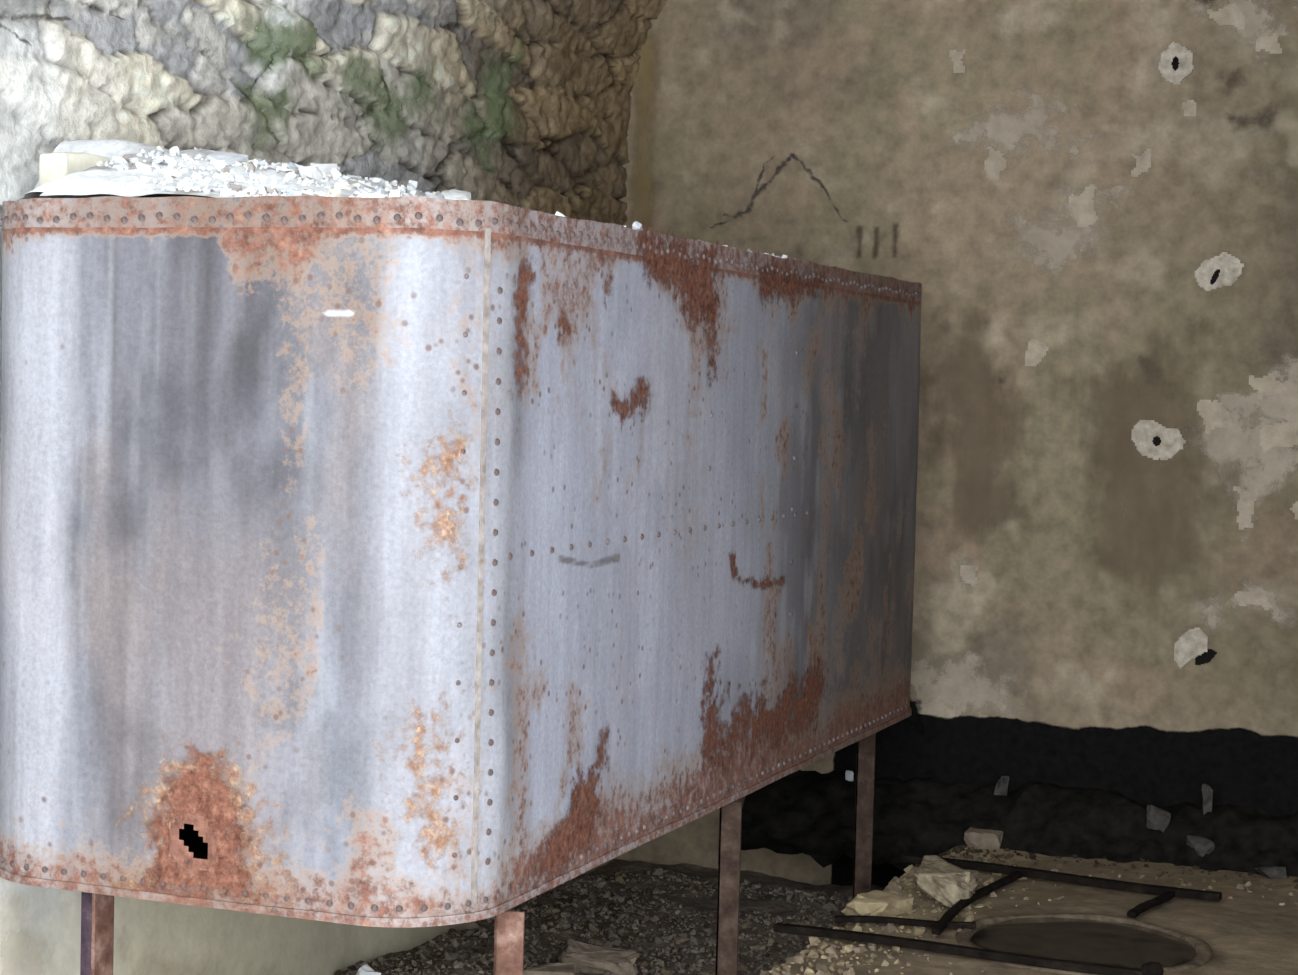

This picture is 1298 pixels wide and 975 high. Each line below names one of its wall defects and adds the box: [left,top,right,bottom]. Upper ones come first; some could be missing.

crack [0,5,125,46]
peeling [1191,0,1288,59]
spalling [0,0,667,226]
crack [710,153,848,228]
peeling [1184,356,1298,530]